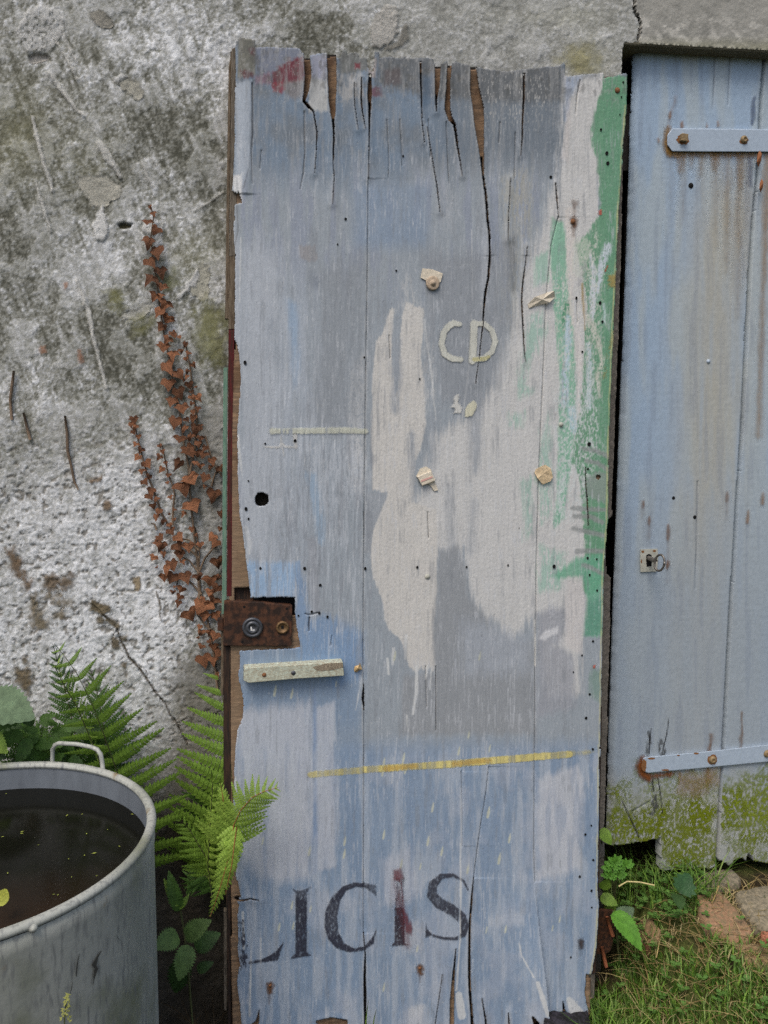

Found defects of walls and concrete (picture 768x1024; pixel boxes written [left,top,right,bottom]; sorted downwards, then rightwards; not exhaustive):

crack [103,614,188,744]
rust [637,756,672,782]